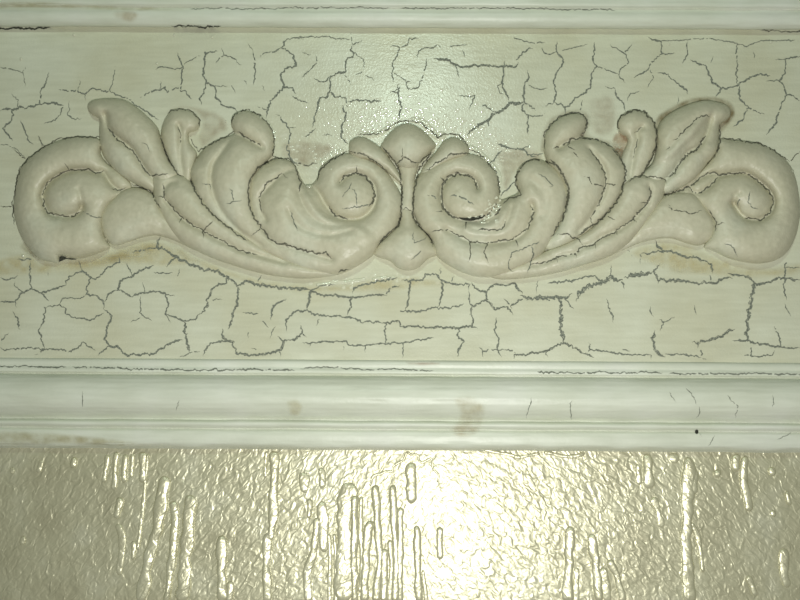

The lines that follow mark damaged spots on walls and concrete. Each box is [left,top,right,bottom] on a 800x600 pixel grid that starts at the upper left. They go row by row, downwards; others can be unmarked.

crack [0,29,800,417]